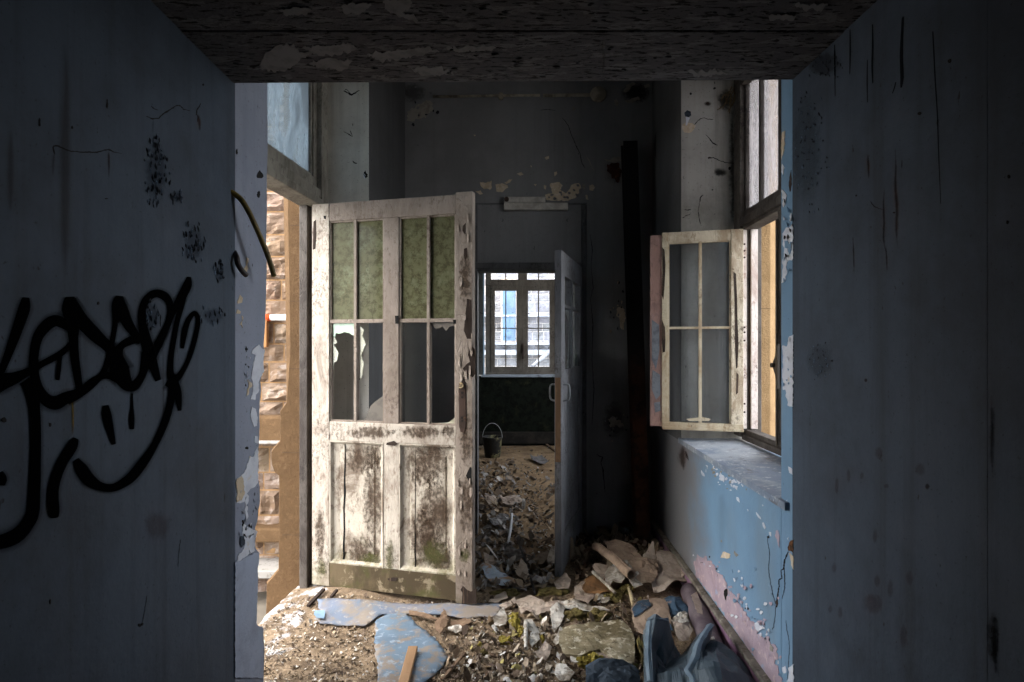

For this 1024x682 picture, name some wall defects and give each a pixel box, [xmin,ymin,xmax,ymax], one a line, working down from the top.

peeling [259,42,498,76]
peeling [341,0,422,23]
crack [146,103,201,129]
peeling [534,172,595,201]
peeling [781,131,794,283]
peeling [234,344,265,678]
peeling [701,465,794,570]
peeling [693,540,794,682]
crack [767,538,790,678]